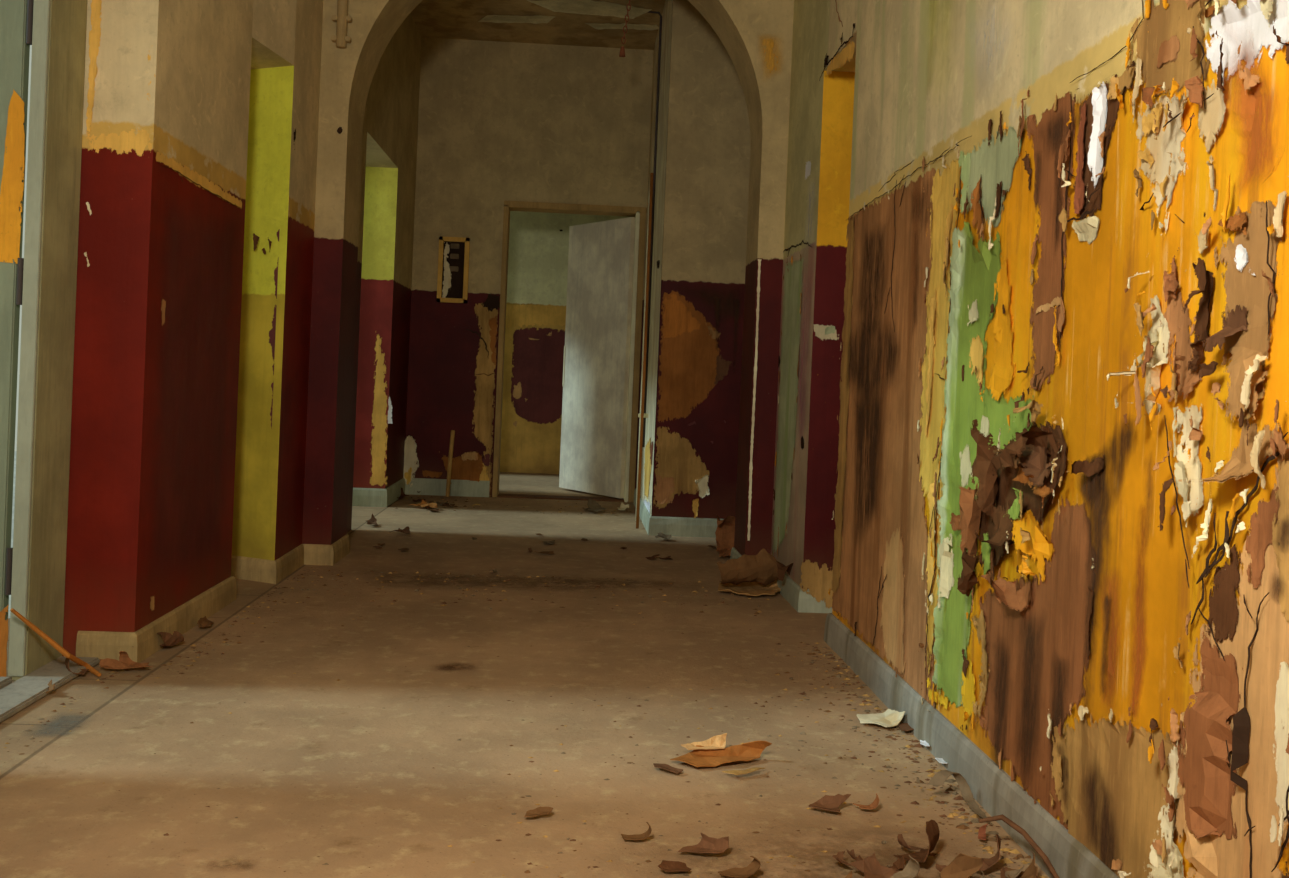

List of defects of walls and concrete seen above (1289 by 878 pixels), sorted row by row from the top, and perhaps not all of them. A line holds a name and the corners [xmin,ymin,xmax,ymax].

peeling [370,335,393,486]
peeling [403,294,566,497]
peeling [478,0,732,520]
peeling [772,0,1289,878]